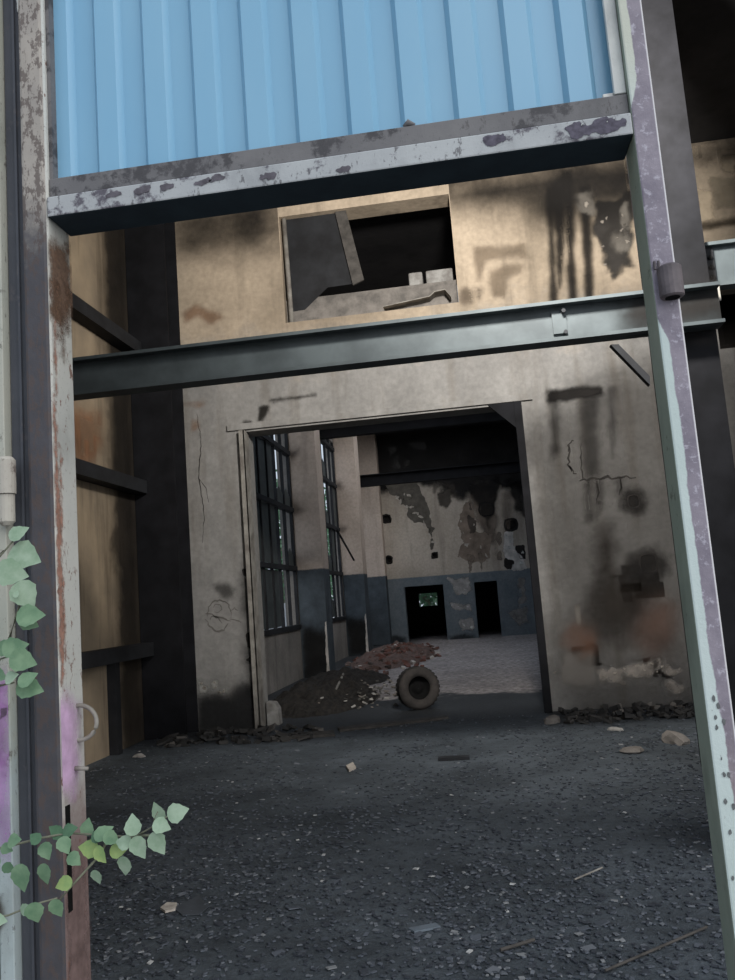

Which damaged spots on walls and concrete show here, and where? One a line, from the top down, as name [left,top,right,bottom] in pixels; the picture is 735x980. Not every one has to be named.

peeling [483,133,506,146]
peeling [564,117,627,139]
peeling [106,183,174,198]
peeling [194,174,225,186]
damp [555,214,593,299]
rust [49,241,73,372]
rust [53,404,66,684]
peeling [385,483,438,559]
damp [438,485,453,507]
flaking render [447,502,527,631]
damp [469,477,525,542]
crack [567,440,636,504]